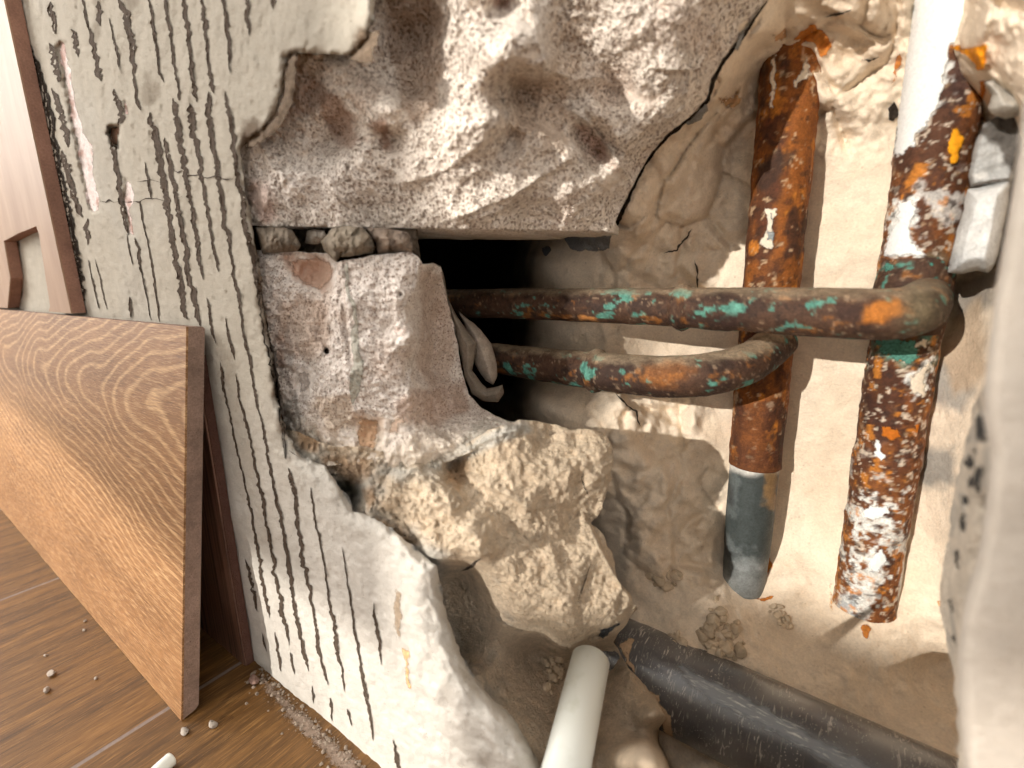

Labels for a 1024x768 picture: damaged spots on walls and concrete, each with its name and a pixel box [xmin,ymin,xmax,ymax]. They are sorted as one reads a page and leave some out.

spalling [241,0,766,240]
crack [616,0,768,226]
corrosion [775,25,832,57]
corrosion [953,44,988,99]
spalling [257,250,670,768]